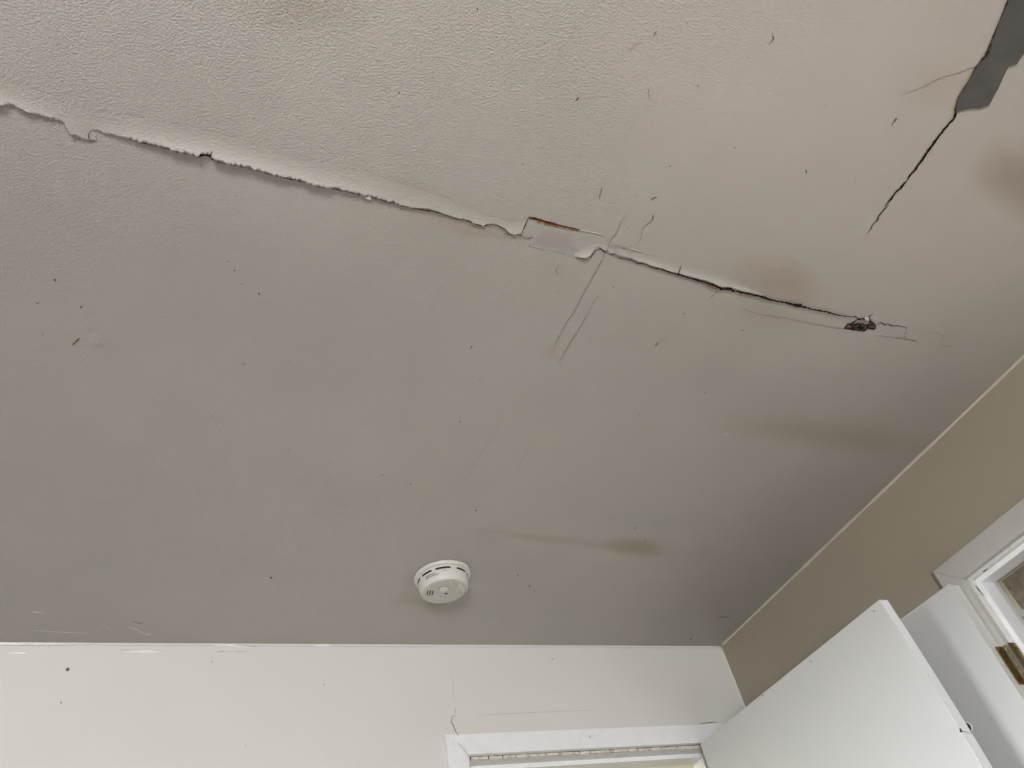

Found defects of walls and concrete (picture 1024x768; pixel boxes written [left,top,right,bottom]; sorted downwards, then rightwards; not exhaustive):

peeling [0,80,527,235]
crack [870,0,1008,231]
crack [555,215,853,364]